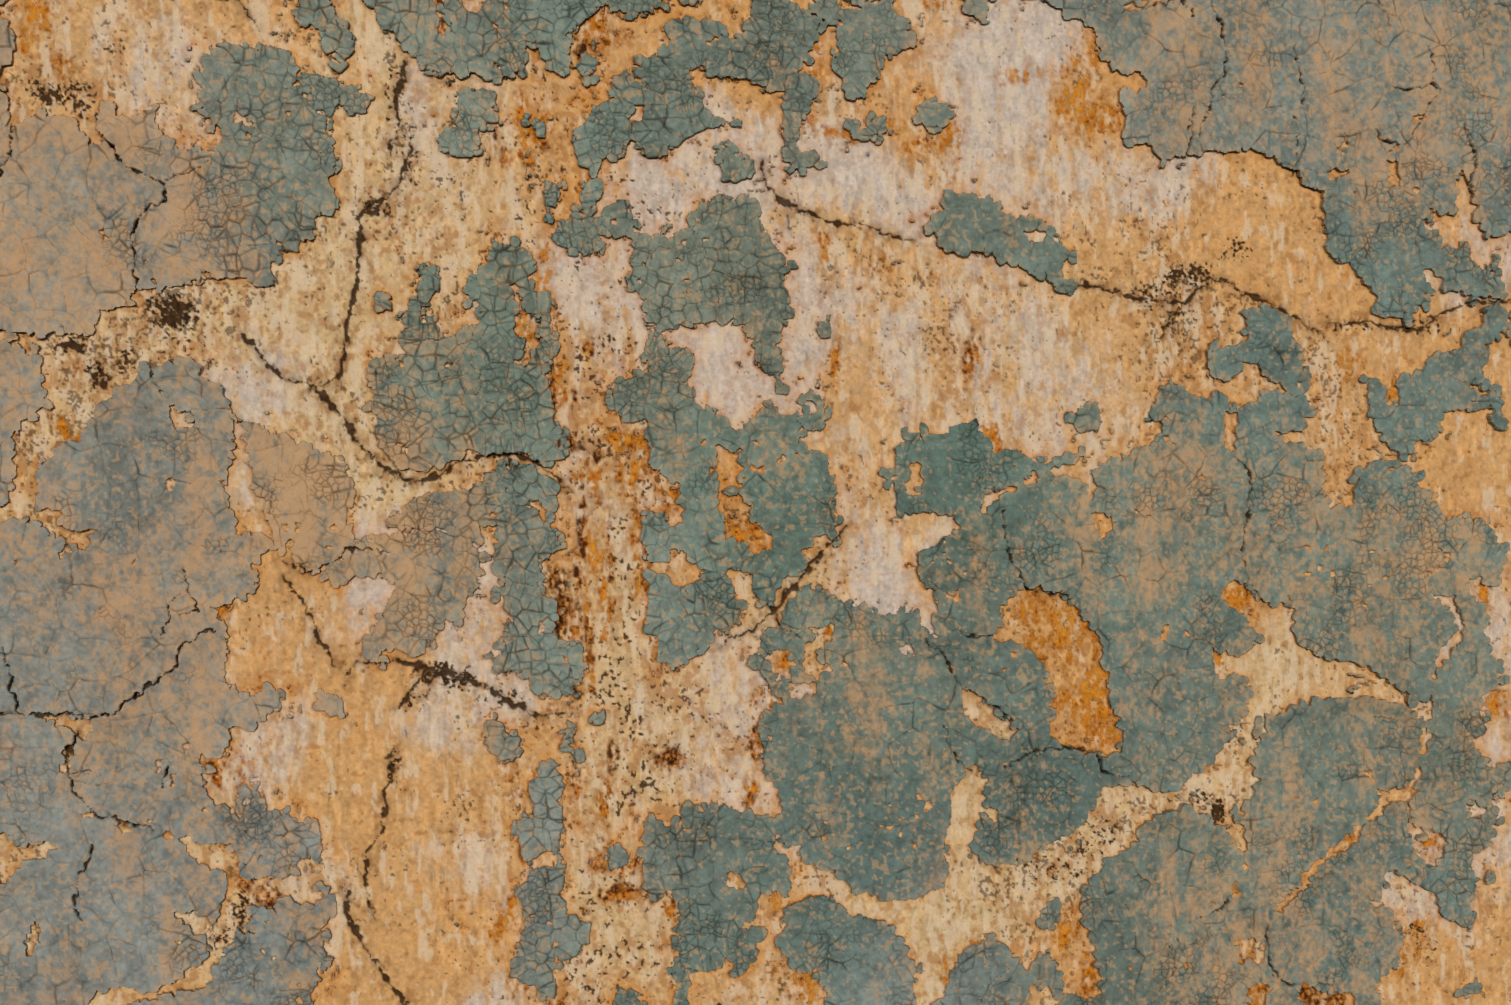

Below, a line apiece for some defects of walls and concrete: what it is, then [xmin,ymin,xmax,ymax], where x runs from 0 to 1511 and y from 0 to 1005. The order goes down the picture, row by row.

crack [0,569,215,916]
crack [343,765,409,1005]
crack [242,61,561,485]
crack [284,563,565,717]
peeling [0,0,962,1005]
rust [570,740,619,820]
rust [549,429,679,698]
rust [590,850,640,903]
peeling [591,0,1511,769]
peeling [687,579,1449,1005]
rust [1019,586,1121,757]
peeling [1369,789,1511,1005]